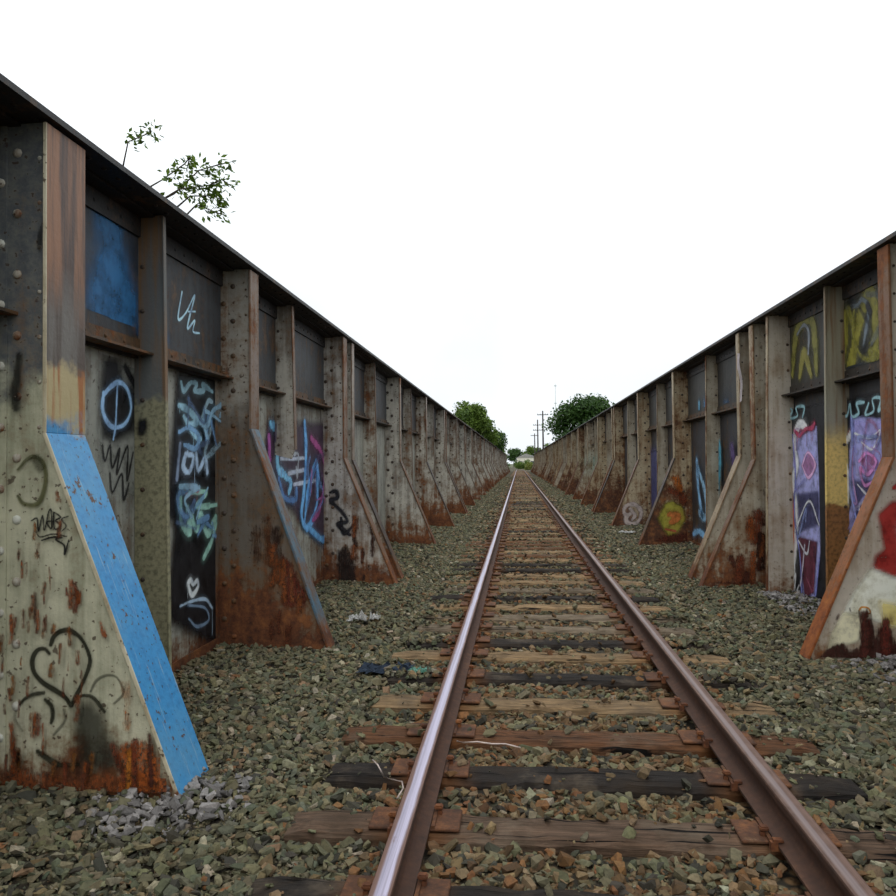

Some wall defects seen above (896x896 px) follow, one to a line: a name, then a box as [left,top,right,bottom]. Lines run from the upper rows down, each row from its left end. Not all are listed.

corrosion [666,475,687,506]
corrosion [252,516,308,647]
corrosion [350,515,375,563]
corrosion [656,533,687,542]
corrosion [716,508,766,585]
corrosion [0,567,166,793]